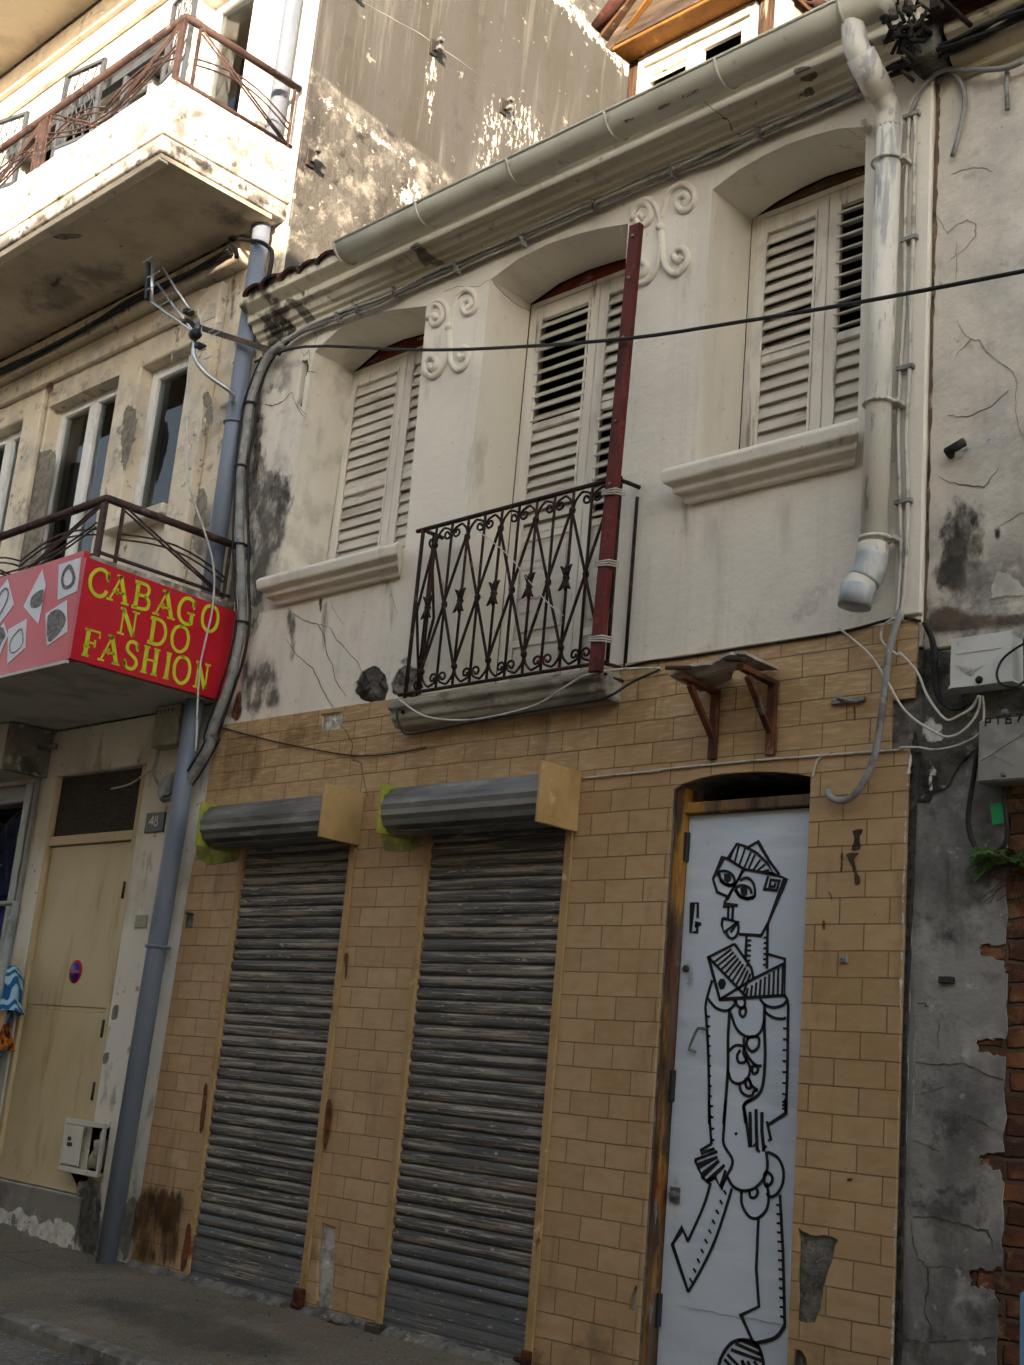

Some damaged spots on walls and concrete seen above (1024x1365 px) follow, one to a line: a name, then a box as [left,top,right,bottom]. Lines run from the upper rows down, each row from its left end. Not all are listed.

leakage [476,98,543,169]
crack [936,215,977,280]
crack [948,320,1024,436]
leakage [249,414,290,628]
leakage [935,505,982,592]
crack [938,469,998,488]
leakage [927,607,1024,632]
crack [289,602,368,796]
leakage [909,645,1024,802]
peeling [0,1207,76,1250]
spalling [799,1230,838,1323]
spalling [795,1350,807,1365]